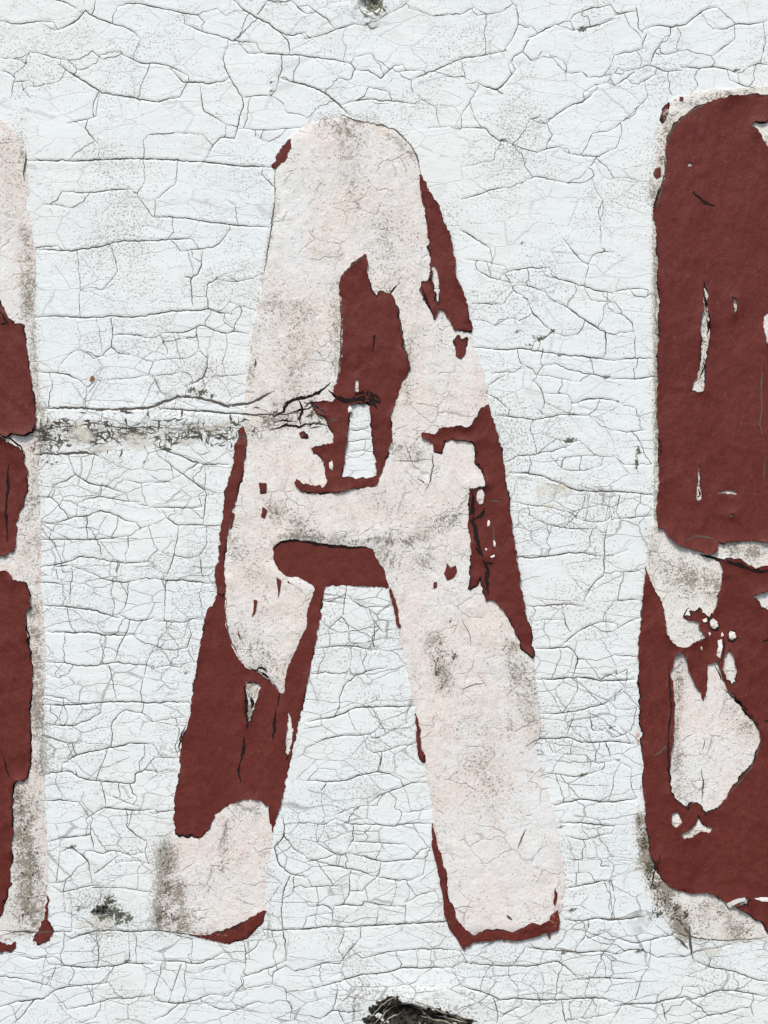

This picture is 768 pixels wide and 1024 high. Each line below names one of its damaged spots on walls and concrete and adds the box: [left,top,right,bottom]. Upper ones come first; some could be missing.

peeling [0,119,48,940]
peeling [154,798,273,934]
crack [0,0,768,695]
crack [0,587,768,1024]
peeling [224,116,565,935]
crack [461,230,662,805]
peeling [636,804,768,943]
peeling [645,86,768,839]